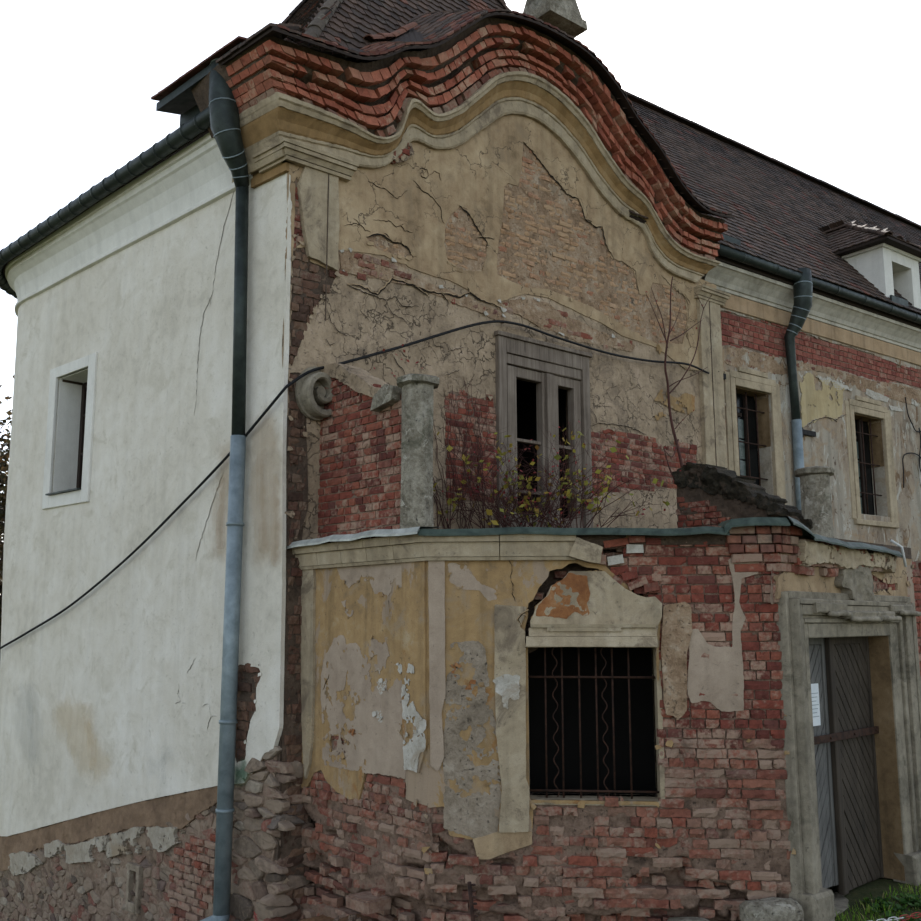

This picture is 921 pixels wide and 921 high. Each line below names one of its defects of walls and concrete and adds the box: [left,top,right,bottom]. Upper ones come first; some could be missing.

spalling [285,143,697,546]
spalling [280,525,796,921]